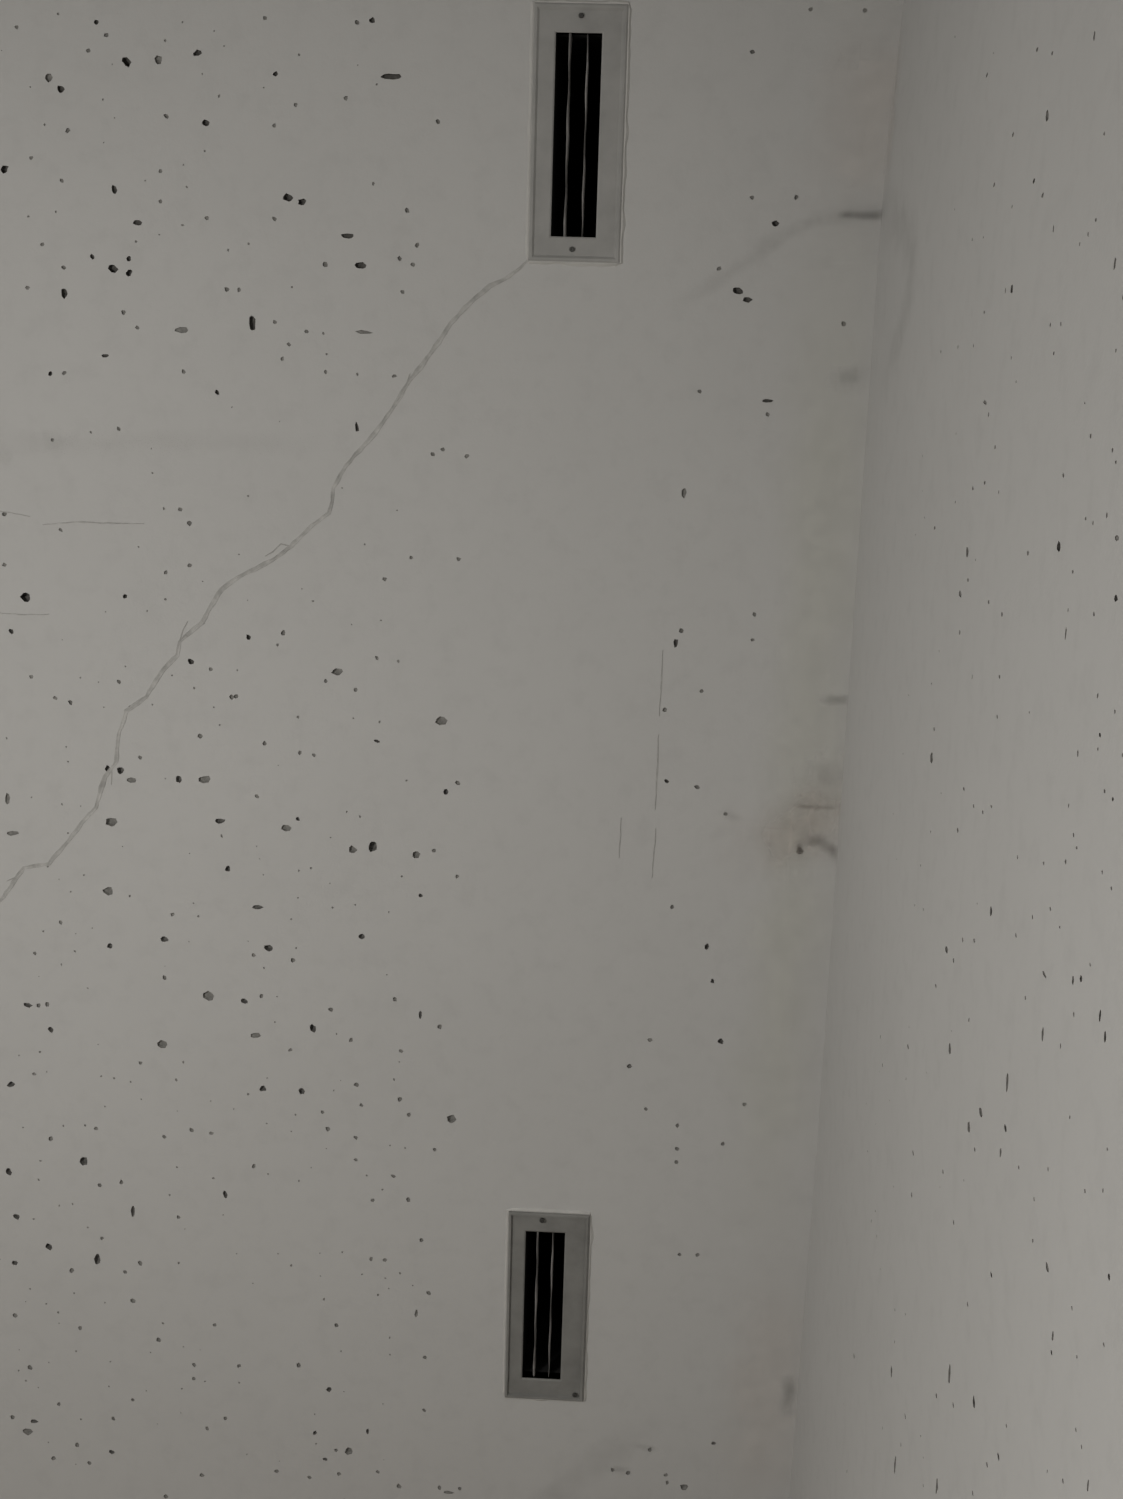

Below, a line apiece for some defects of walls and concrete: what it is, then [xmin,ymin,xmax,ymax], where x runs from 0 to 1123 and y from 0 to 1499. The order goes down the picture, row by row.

crack [0,259,528,902]
crack [619,650,663,876]